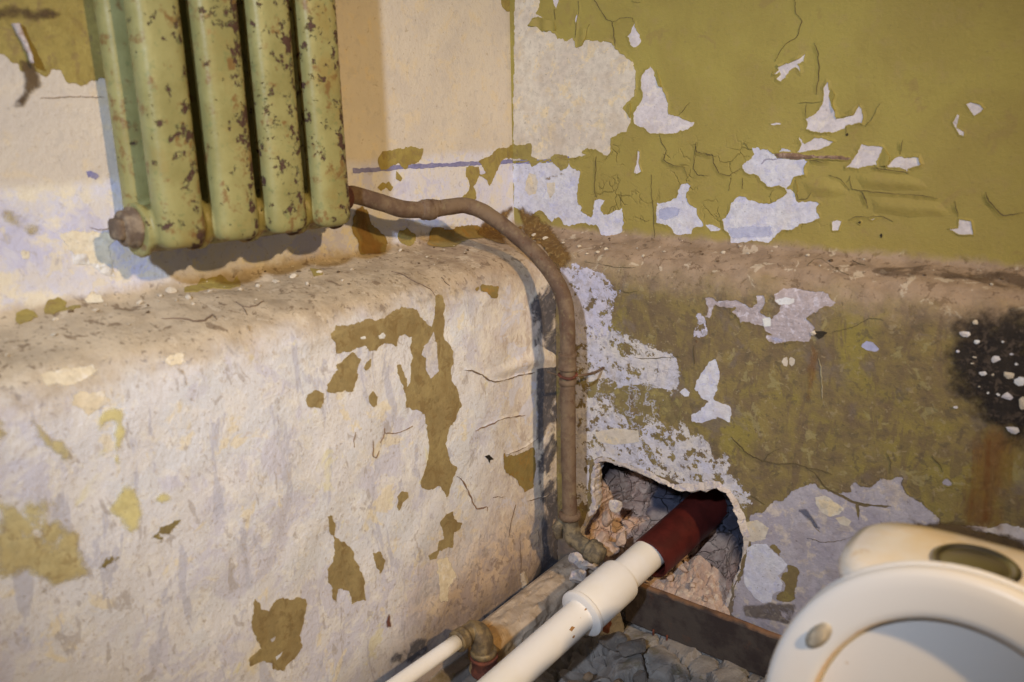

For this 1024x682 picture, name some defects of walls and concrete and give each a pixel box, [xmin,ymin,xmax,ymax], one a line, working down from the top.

peeling [771,51,809,85]
peeling [511,0,697,237]
crack [592,134,751,238]
peeling [654,78,925,246]
crack [769,138,959,225]
peeling [947,217,976,237]
crack [981,192,1024,220]
peeling [16,309,38,324]
peeling [41,364,110,415]
peeling [422,332,439,378]
spalling [560,263,1024,635]
crack [730,437,888,543]